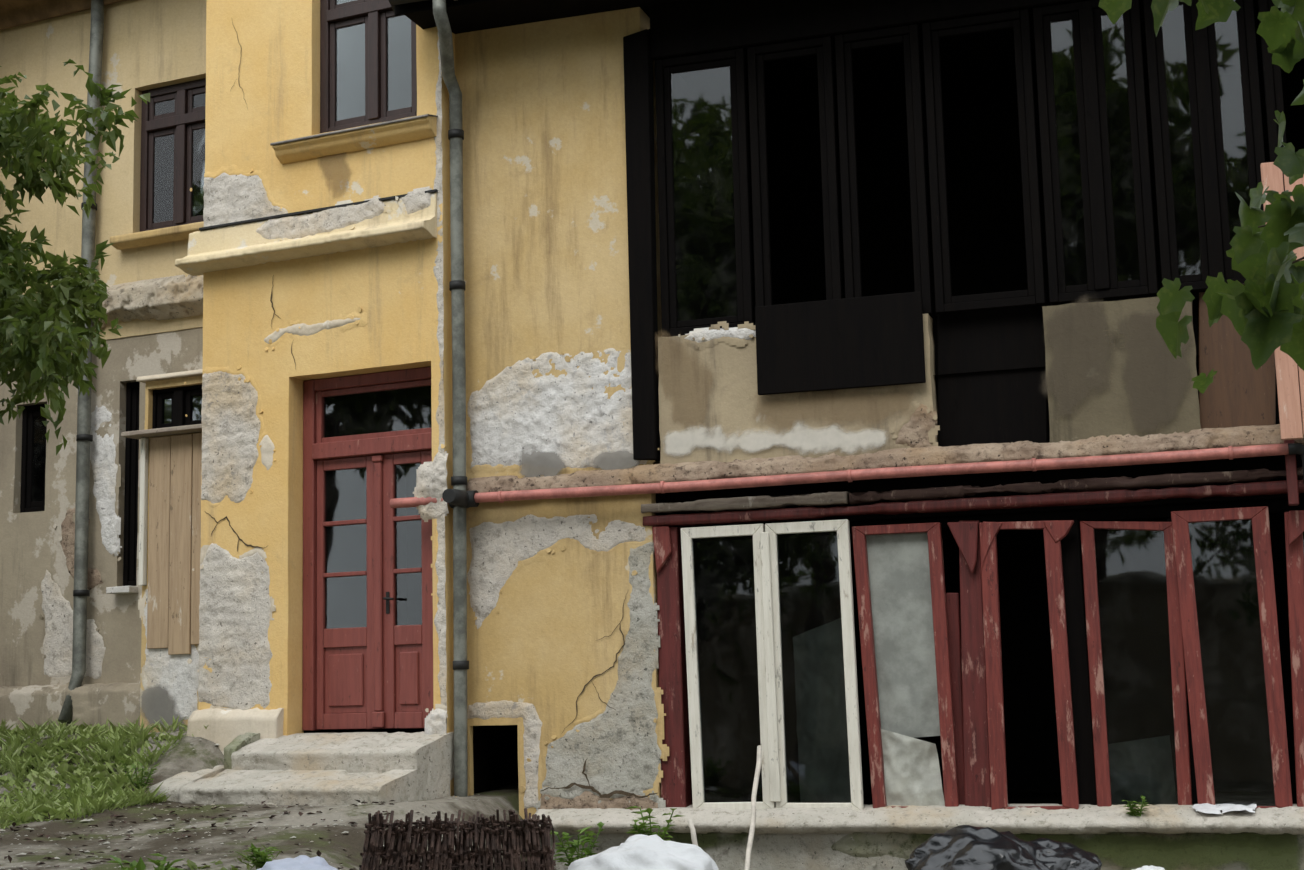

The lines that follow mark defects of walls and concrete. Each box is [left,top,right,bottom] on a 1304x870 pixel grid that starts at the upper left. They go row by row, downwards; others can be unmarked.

spalling [185,33,449,735]
spalling [466,346,659,476]
peeling [678,321,756,351]
spalling [878,401,940,451]
spalling [38,406,122,680]
crack [207,513,266,552]
spalling [138,543,276,720]
spalling [466,510,669,810]
crack [561,592,628,734]